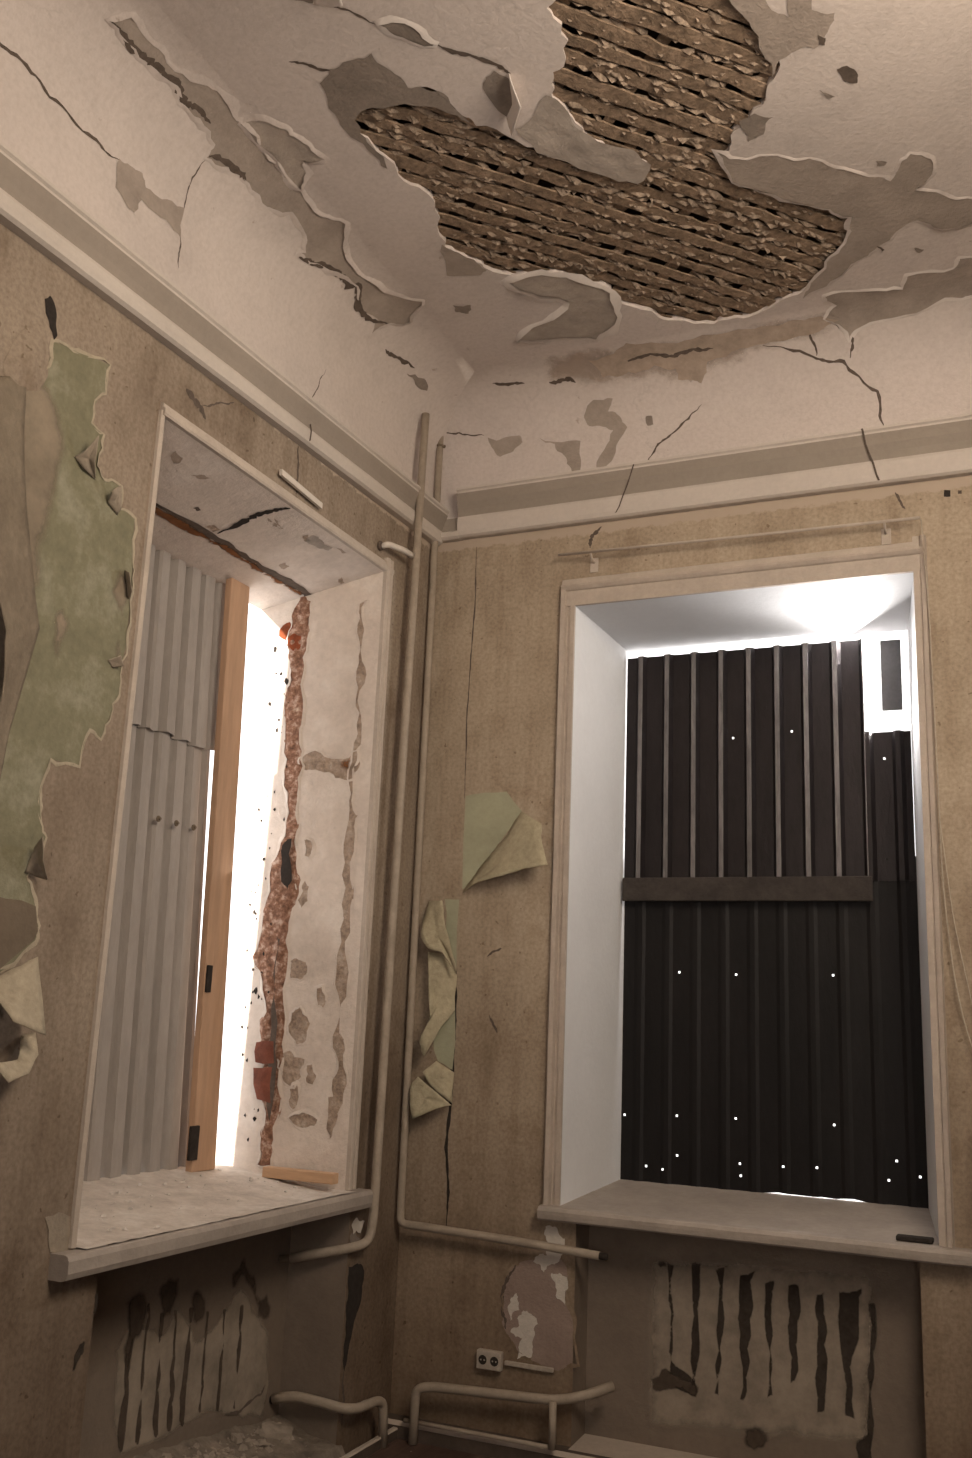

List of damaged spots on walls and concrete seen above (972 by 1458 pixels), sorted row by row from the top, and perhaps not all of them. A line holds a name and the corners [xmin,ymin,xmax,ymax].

peeling [104,11,428,391]
flaking render [291,0,972,383]
crack [217,373,325,534]
crack [588,404,702,548]
crack [763,325,905,509]
flaking render [0,897,38,969]
spalling [240,596,368,1169]
peeling [500,1225,580,1376]